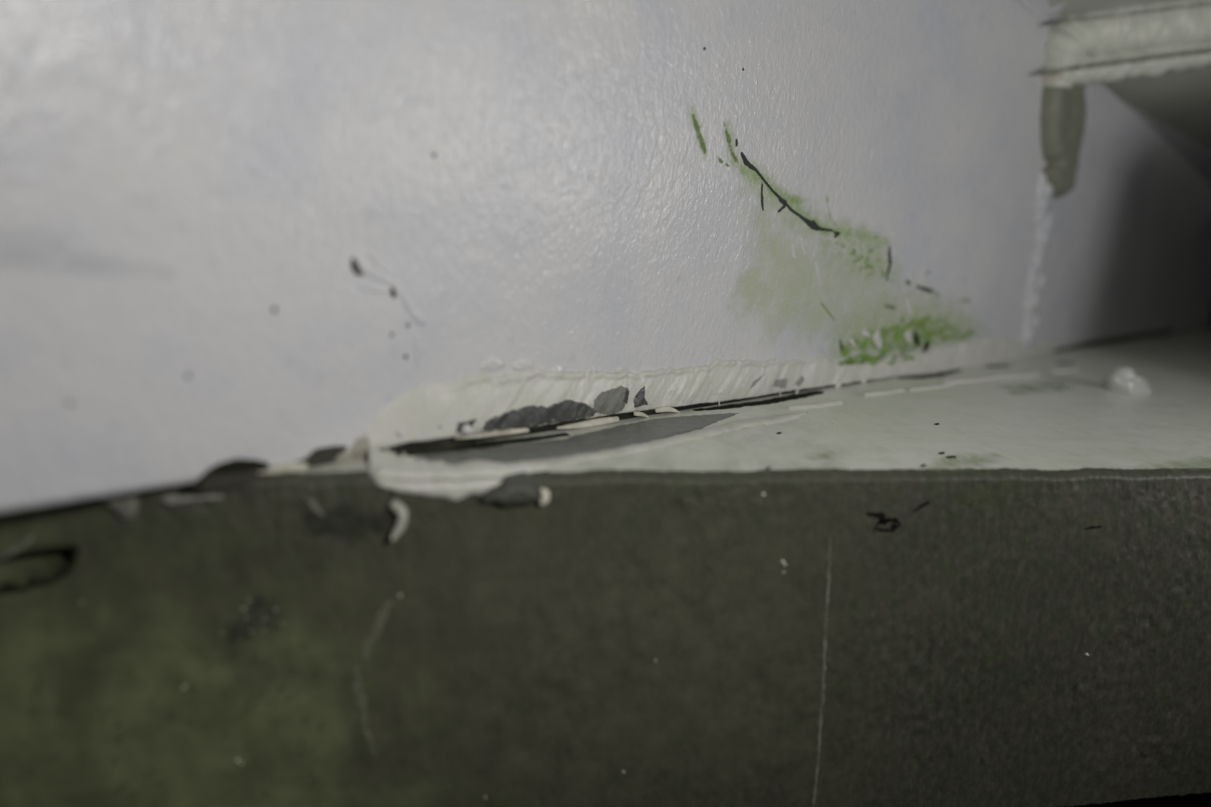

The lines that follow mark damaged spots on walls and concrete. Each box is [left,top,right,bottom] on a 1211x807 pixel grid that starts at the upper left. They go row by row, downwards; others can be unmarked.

spalling [913,331,930,352]
peeling [750,374,805,389]
peeling [415,386,739,465]
spalling [0,535,79,596]